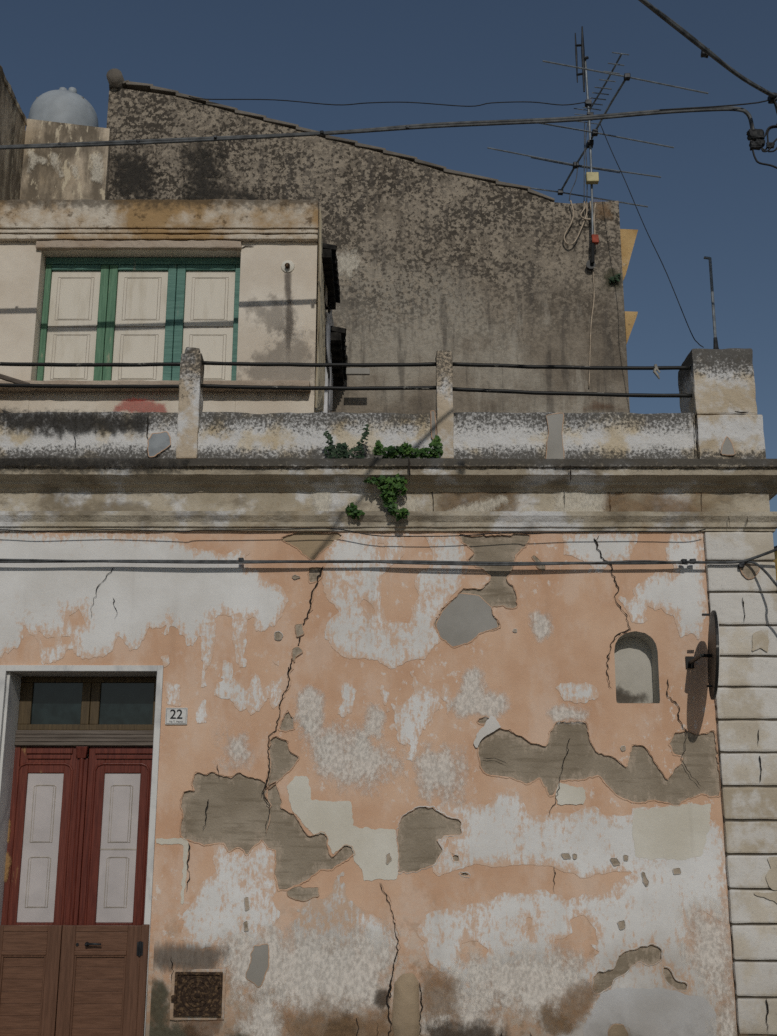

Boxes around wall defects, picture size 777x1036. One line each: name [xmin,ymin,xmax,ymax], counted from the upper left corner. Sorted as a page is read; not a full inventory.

water stain [179,144,265,200]
water stain [337,254,360,276]
water stain [285,273,293,346]
water stain [0,399,166,438]
crack [594,536,631,688]
crack [262,567,324,833]
peeling [0,532,736,1036]
water stain [153,946,224,969]
crack [356,883,401,1036]
water stain [149,981,197,1036]
crack [417,983,425,1036]
water stain [427,1021,495,1036]